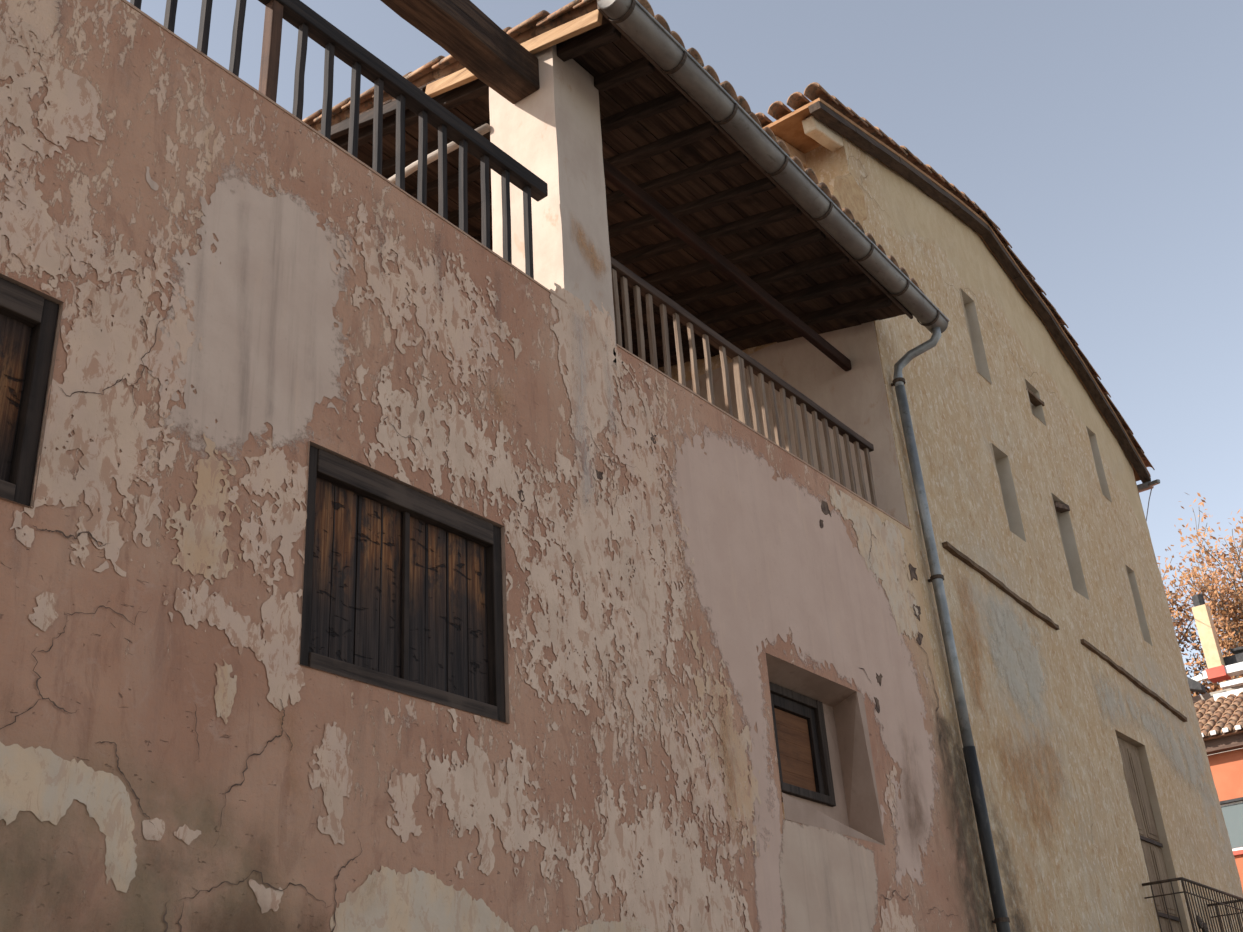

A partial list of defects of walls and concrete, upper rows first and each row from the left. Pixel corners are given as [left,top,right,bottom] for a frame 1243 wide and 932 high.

spalling [833,173,867,226]
peeling [0,21,309,724]
peeling [326,180,769,932]
peeling [819,481,923,645]
crack [0,605,148,729]
peeling [0,742,201,893]
crack [97,741,154,825]
crack [215,699,293,845]
peeling [308,721,353,845]
crack [163,841,362,932]
peeling [249,879,283,914]
peeling [875,891,916,932]